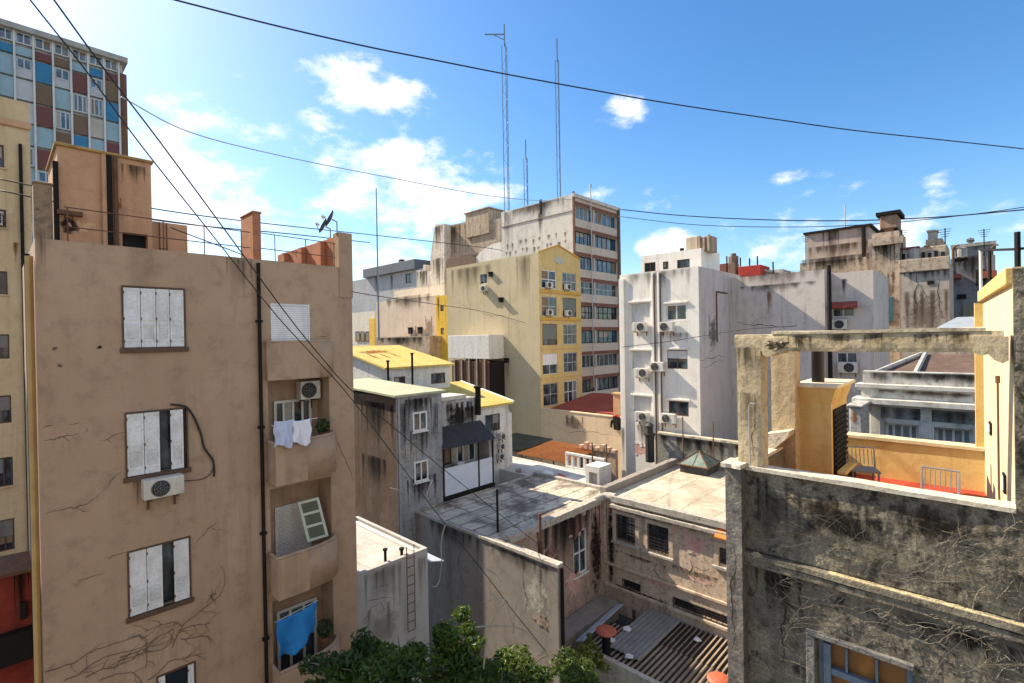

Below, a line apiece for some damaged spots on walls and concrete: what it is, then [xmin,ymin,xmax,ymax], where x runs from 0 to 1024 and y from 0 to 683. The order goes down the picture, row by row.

leakage [802,231,895,267]
crack [914,272,942,316]
crack [43,422,123,443]
leakage [361,398,473,466]
crack [46,468,125,514]
leakage [757,481,871,545]
leakage [897,505,988,538]
leakage [755,568,801,605]